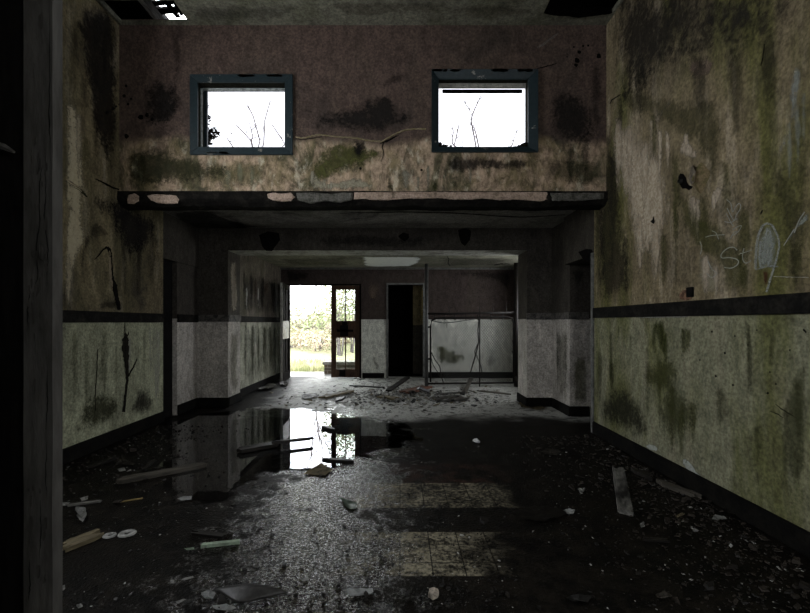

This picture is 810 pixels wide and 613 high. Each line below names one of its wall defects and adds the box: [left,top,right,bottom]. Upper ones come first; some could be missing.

damp [617,0,788,101]
damp [78,10,117,159]
damp [145,80,178,122]
damp [317,97,407,133]
crack [295,128,426,161]
spalling [127,193,179,204]
spalling [267,192,604,204]
damp [600,140,627,295]
crack [94,246,137,412]
damp [78,396,117,430]
damp [132,393,151,412]
damp [603,391,646,433]